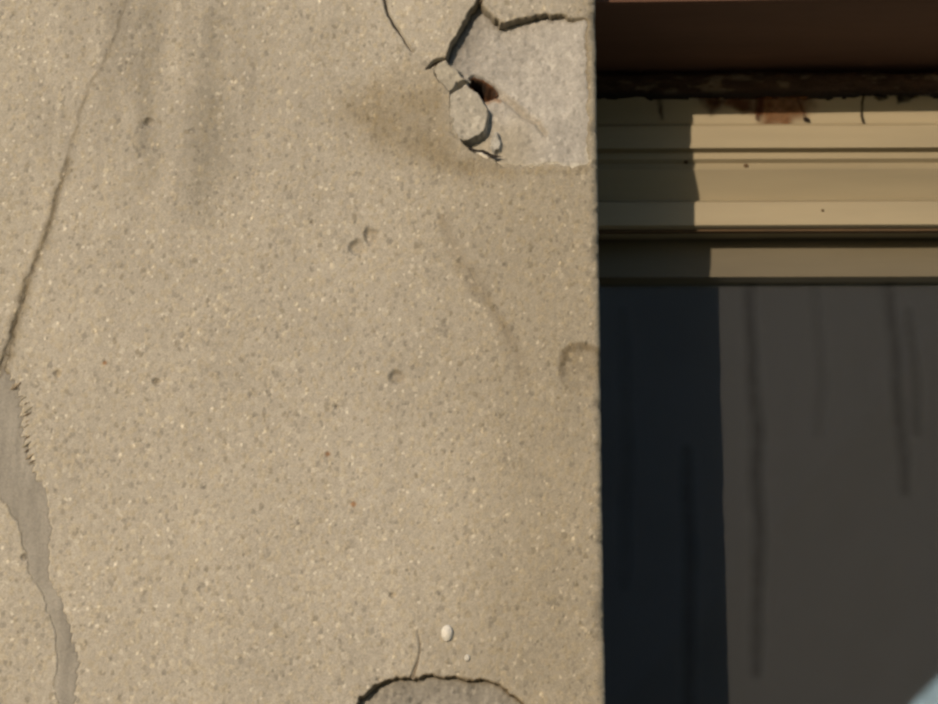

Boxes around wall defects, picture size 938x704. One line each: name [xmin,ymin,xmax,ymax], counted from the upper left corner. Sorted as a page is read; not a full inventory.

crack [384,0,410,50]
spalling [429,7,589,168]
rust [699,95,810,124]
crack [0,294,81,704]